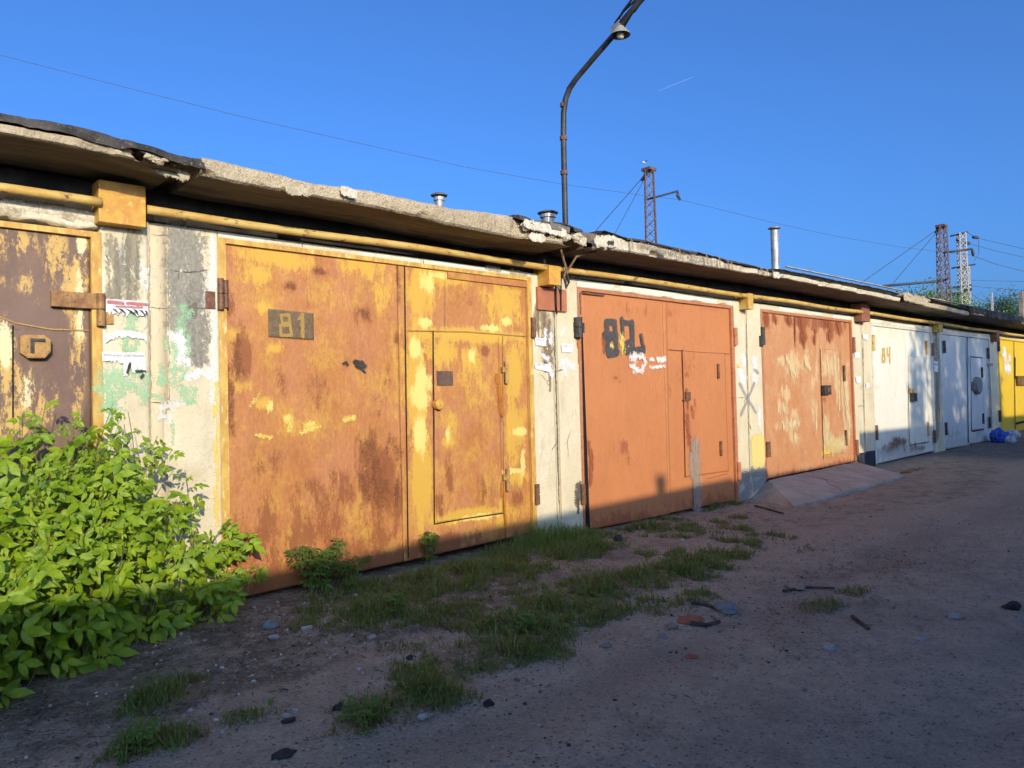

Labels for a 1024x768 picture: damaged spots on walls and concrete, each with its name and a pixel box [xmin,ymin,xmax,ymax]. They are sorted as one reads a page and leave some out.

spalling [142,153,190,182]
spalling [520,218,618,251]
rust [763,308,842,348]
peeling [131,219,221,527]
rust [495,374,504,417]